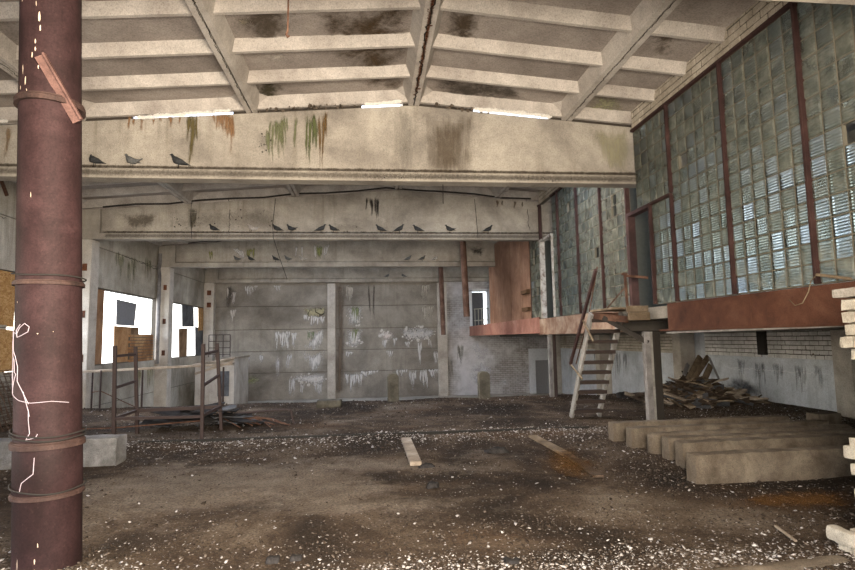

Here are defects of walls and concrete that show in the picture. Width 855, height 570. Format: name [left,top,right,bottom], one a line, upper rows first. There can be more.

leakage [328,10,400,35]
leakage [345,48,391,67]
crack [413,0,436,101]
leakage [451,15,475,38]
leakage [82,109,636,182]
leakage [275,331,297,375]
leakage [304,315,325,369]
leakage [337,286,378,391]
leakage [383,330,438,386]